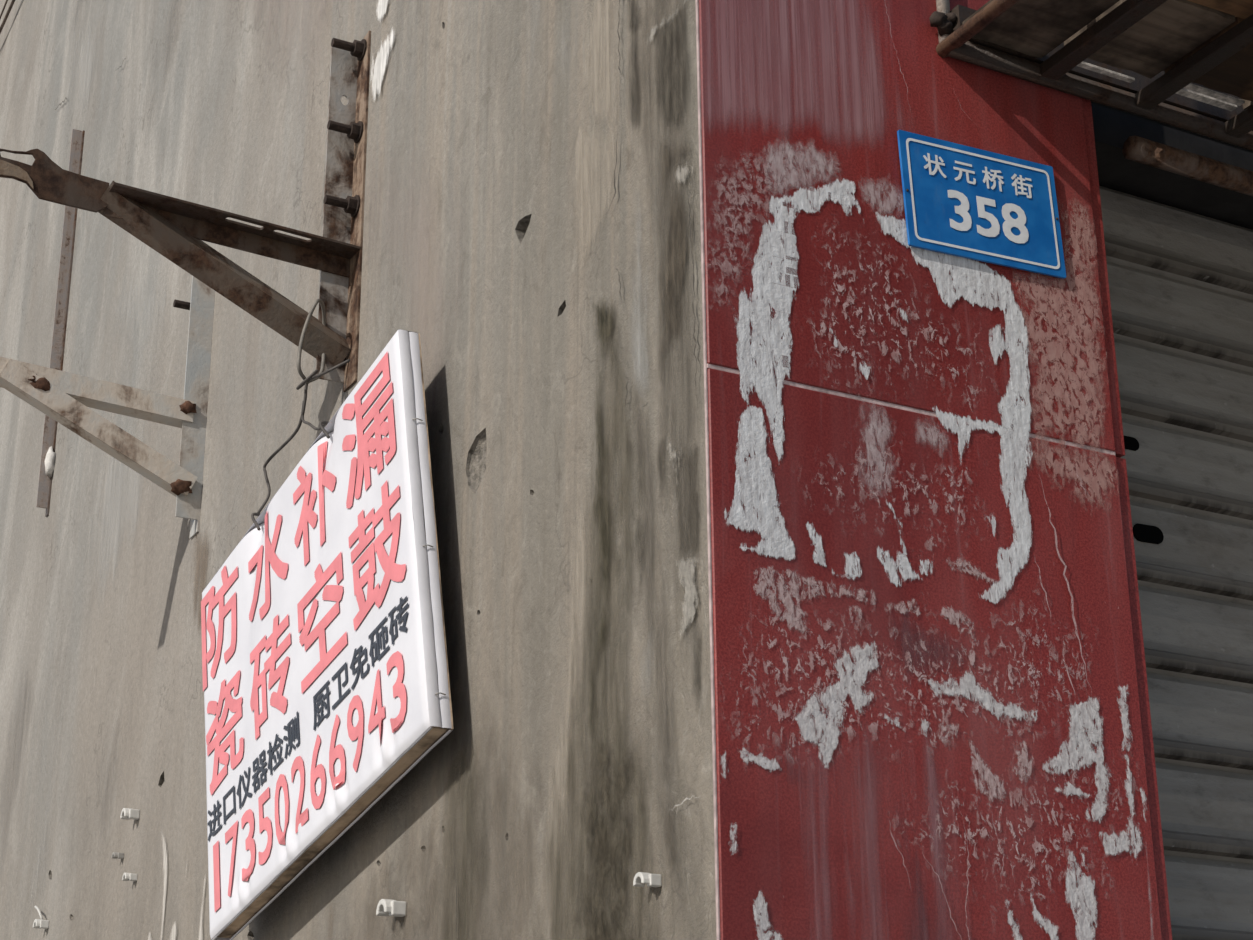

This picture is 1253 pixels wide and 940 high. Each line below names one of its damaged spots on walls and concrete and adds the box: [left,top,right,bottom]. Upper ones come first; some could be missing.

water stain [628,0,637,122]
peeling [820,182,1117,603]
peeling [725,406,920,633]
water stain [548,354,648,940]
peeling [721,748,779,778]
peeling [795,642,878,768]
peeling [940,607,978,645]
peeling [928,671,1037,721]
peeling [905,686,1146,940]
peeling [753,891,782,940]